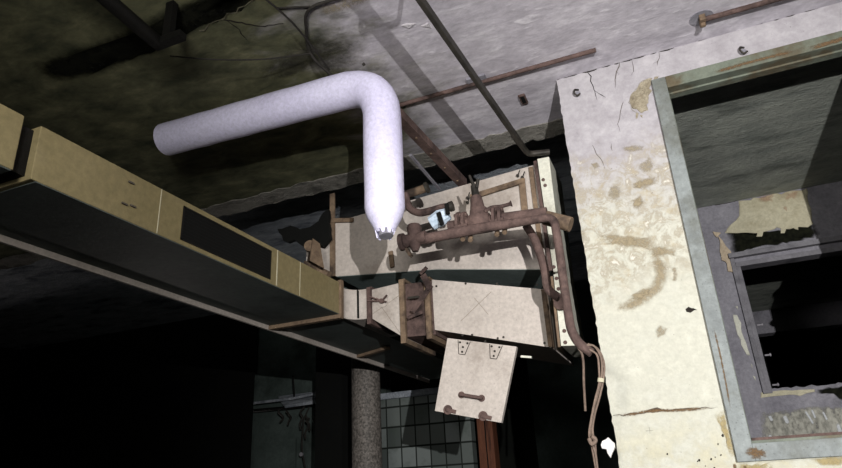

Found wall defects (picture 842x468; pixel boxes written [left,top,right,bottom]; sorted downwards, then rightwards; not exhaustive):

crack [558,48,673,168]
spalling [628,76,659,119]
peeling [713,189,816,272]
damp [607,235,676,308]
crack [613,407,716,431]